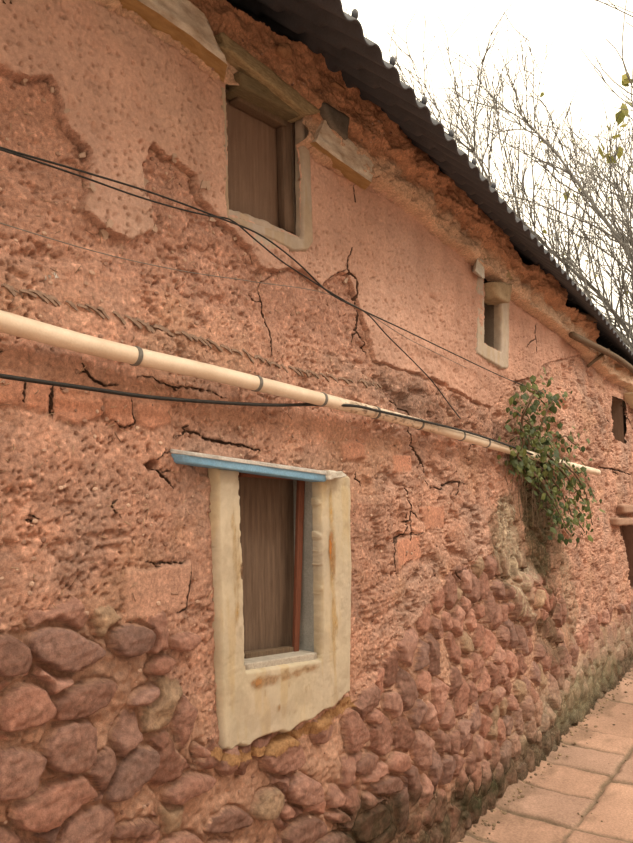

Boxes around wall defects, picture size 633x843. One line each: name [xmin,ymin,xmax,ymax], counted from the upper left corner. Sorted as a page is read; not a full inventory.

spalling [0,63,380,376]
crack [251,275,272,352]
crack [327,247,366,355]
crack [47,386,55,416]
crack [79,363,136,428]
crack [143,375,226,398]
crack [149,425,260,489]
crack [389,400,468,498]
crack [392,488,423,577]